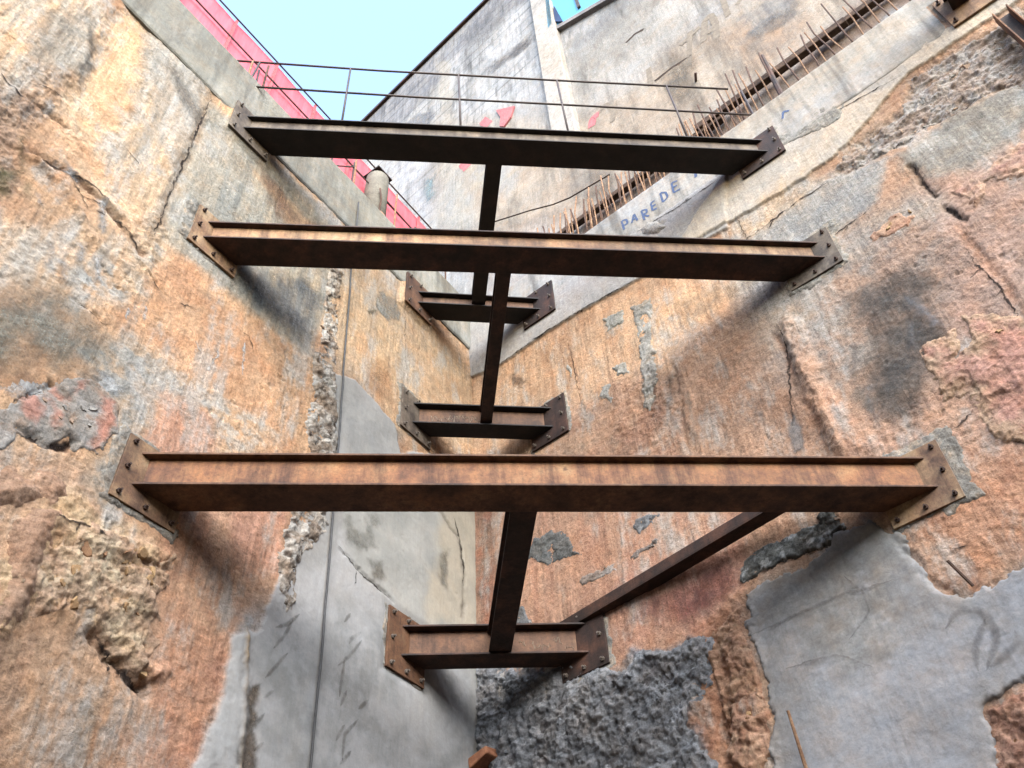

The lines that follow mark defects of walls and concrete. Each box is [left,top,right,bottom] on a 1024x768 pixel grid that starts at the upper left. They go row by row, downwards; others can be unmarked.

spalling [835,25,1024,173]
crack [42,101,210,247]
crack [915,168,962,220]
peeling [0,377,119,455]
spalling [304,268,344,453]
crack [776,324,795,423]
peeling [919,313,1024,444]
spalling [14,521,177,686]
spalling [277,512,329,612]
peeling [528,530,582,566]
peeling [740,512,847,583]
spalling [475,609,774,768]